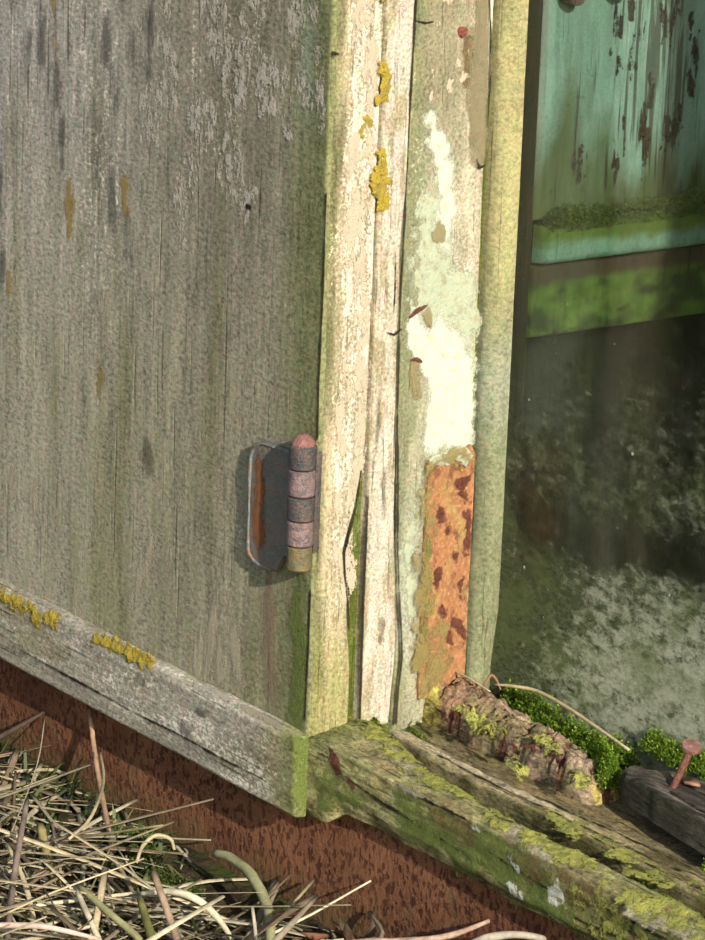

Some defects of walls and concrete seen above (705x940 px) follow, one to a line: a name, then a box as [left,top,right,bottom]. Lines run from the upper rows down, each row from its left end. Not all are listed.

peeling [446,48,470,94]
peeling [609,0,646,81]
peeling [639,0,701,181]
peeling [406,67,482,472]
corrosion [437,504,450,535]
corrosion [453,475,472,560]
crack [342,471,369,719]
corrosion [433,567,442,588]
corrosion [440,605,467,645]
crack [348,779,548,889]
crack [438,755,705,890]
crack [569,899,667,940]